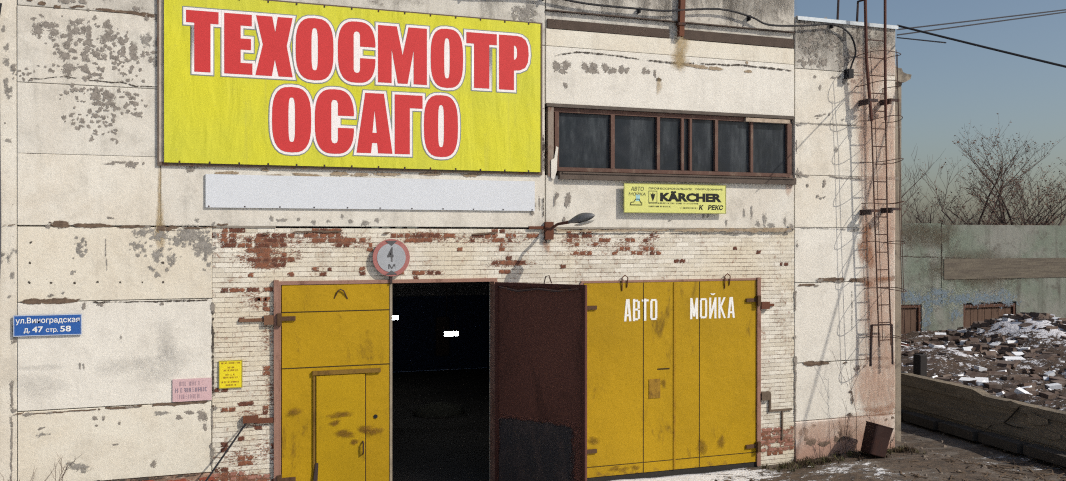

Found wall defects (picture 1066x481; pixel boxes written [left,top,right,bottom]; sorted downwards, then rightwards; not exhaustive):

peeling [1,0,157,144]
peeling [71,236,88,275]
corrosion [796,56,895,438]
flaking render [129,214,379,481]
peeling [66,462,89,473]
flaking render [761,425,853,456]